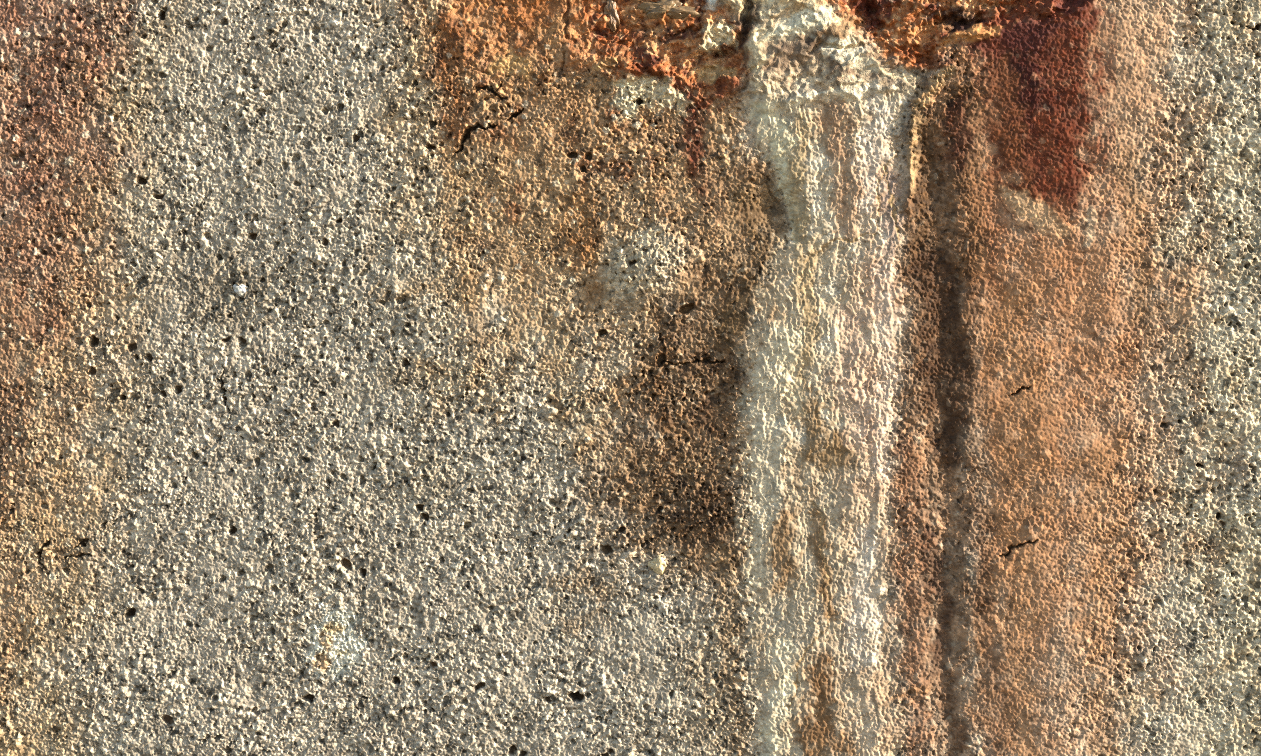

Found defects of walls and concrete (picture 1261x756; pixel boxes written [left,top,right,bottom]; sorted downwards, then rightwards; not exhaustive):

rust [0,0,170,756]
spalling [415,0,744,129]
water stain [561,0,1034,756]
spalling [837,0,1129,73]
crack [999,539,1039,558]
rust [980,0,1261,756]